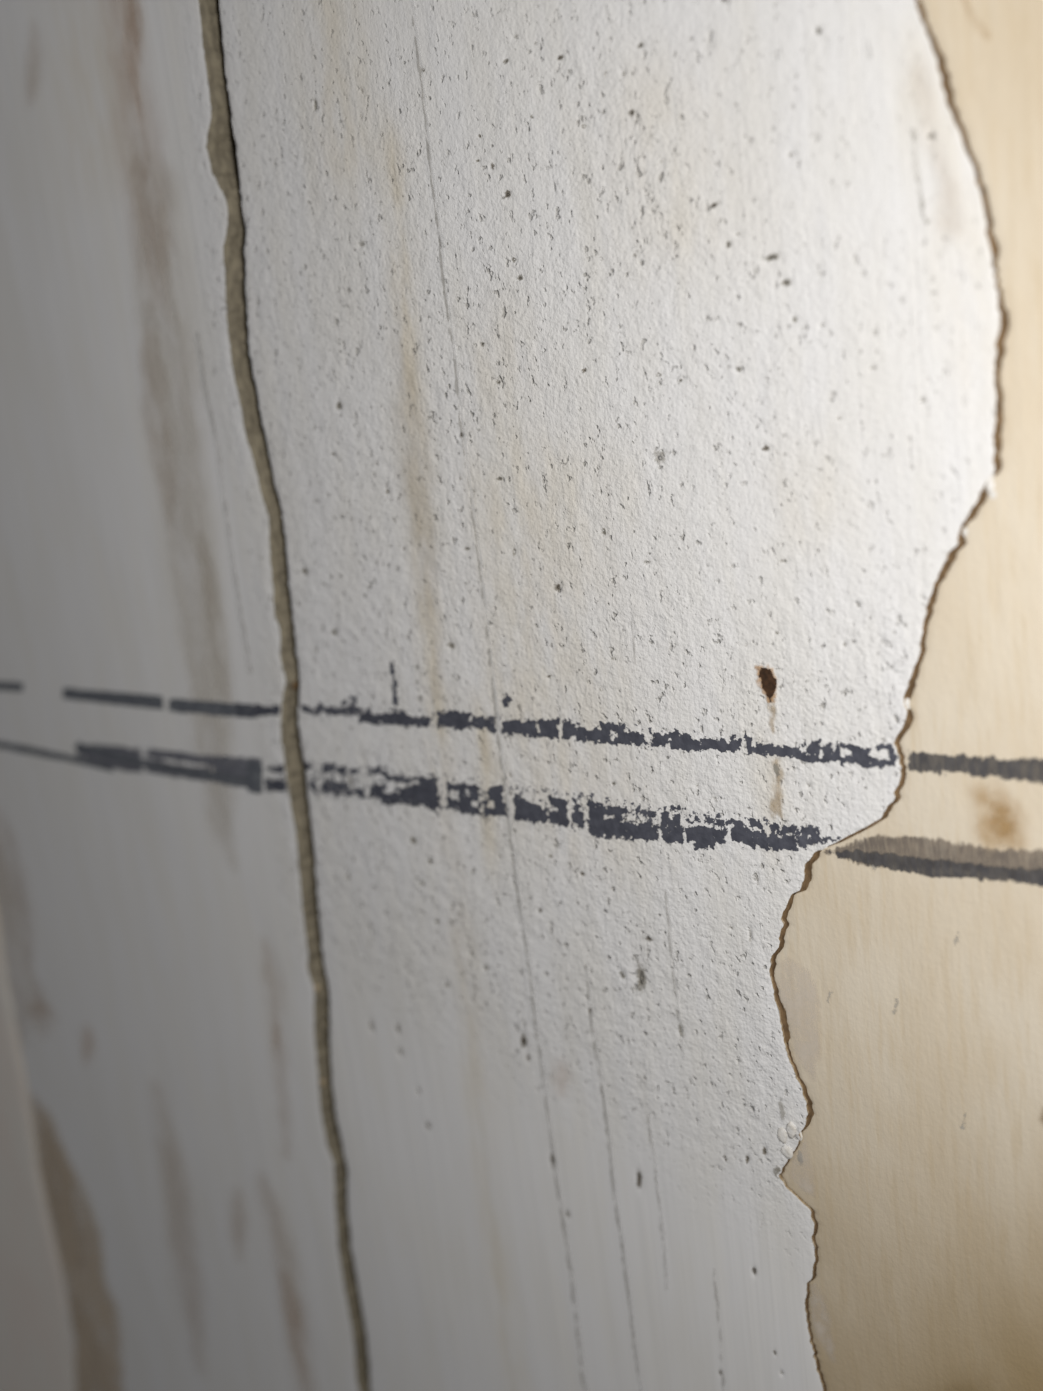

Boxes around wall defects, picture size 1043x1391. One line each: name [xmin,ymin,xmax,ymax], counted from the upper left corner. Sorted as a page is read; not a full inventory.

water stain [35,1105,121,1391]
crack [198,0,371,1391]
corrosion [755,666,777,702]
peeling [746,0,1043,1391]